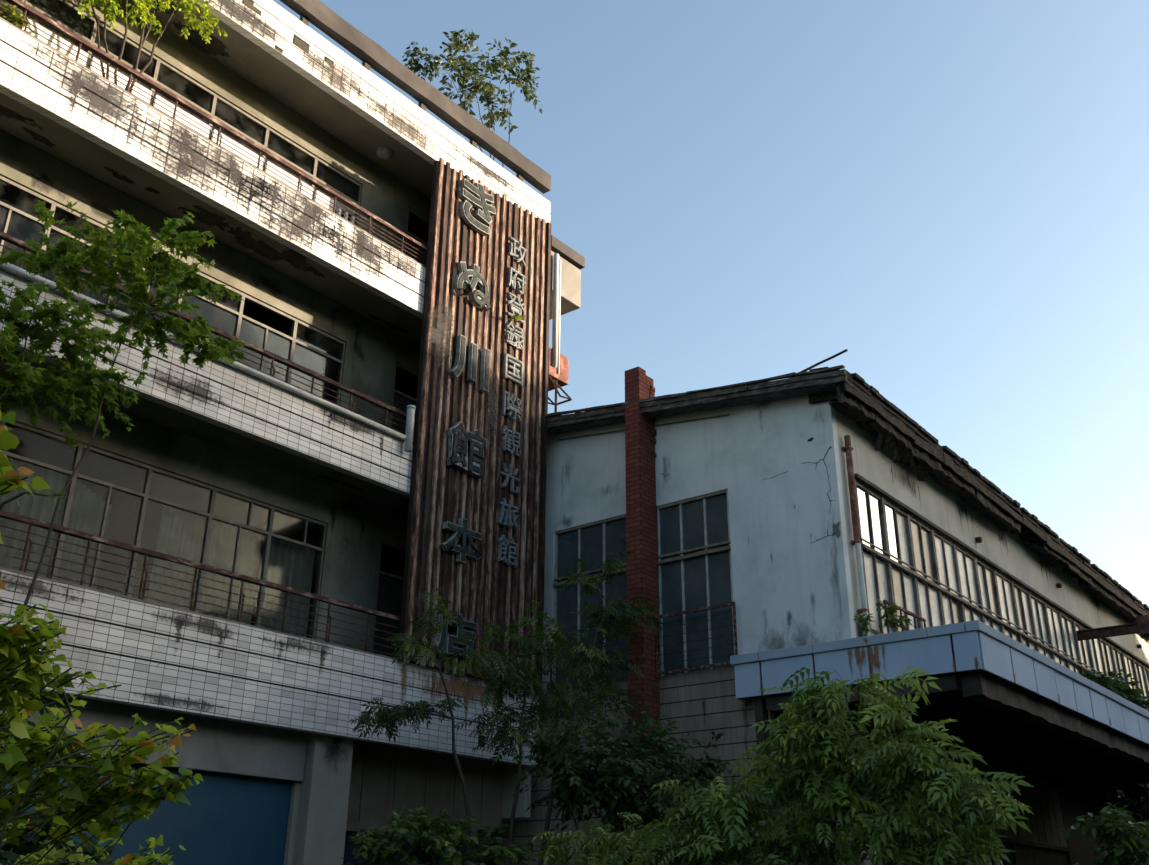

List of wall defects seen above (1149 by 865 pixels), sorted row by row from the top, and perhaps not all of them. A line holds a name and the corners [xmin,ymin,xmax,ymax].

damp [29,44,435,277]
crack [761,447,835,543]
damp [174,619,183,656]
rust [848,639,885,678]
rust [401,665,504,716]